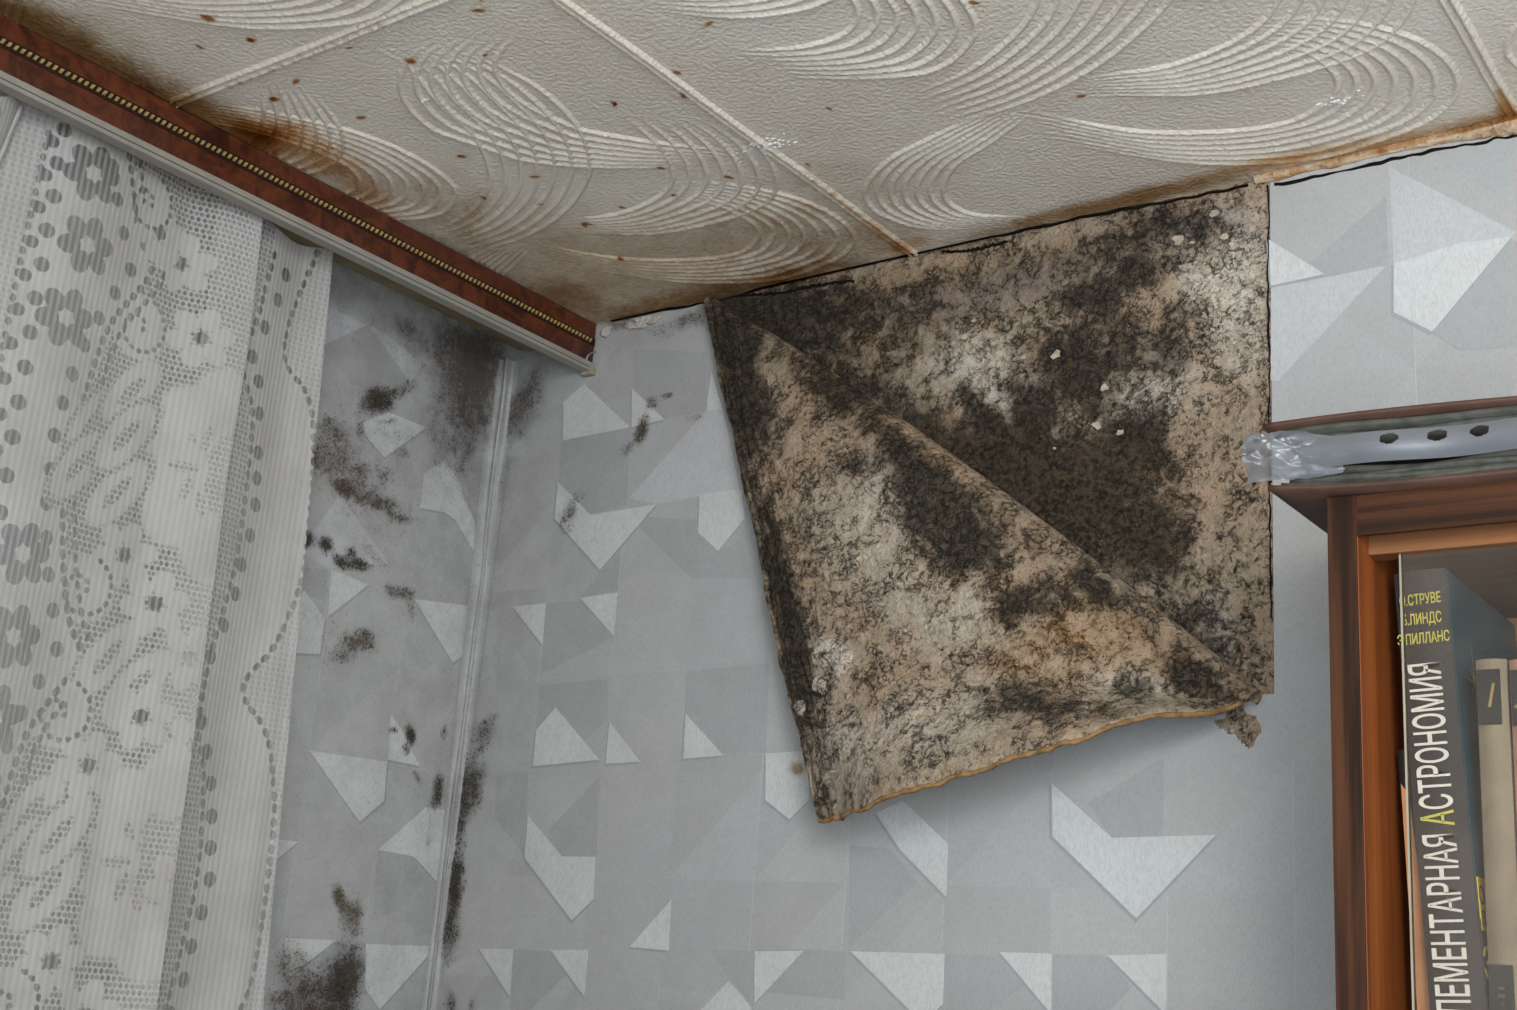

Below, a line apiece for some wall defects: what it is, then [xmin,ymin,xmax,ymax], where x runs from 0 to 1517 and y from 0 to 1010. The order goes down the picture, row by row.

water stain [0,1,266,150]
water stain [1058,182,1205,217]
water stain [311,381,413,523]
water stain [427,321,540,472]
flaking render [696,180,1274,749]
water stain [304,532,414,617]
water stain [327,628,378,665]
water stain [390,724,444,808]
water stain [441,715,495,958]
water stain [268,882,366,1010]